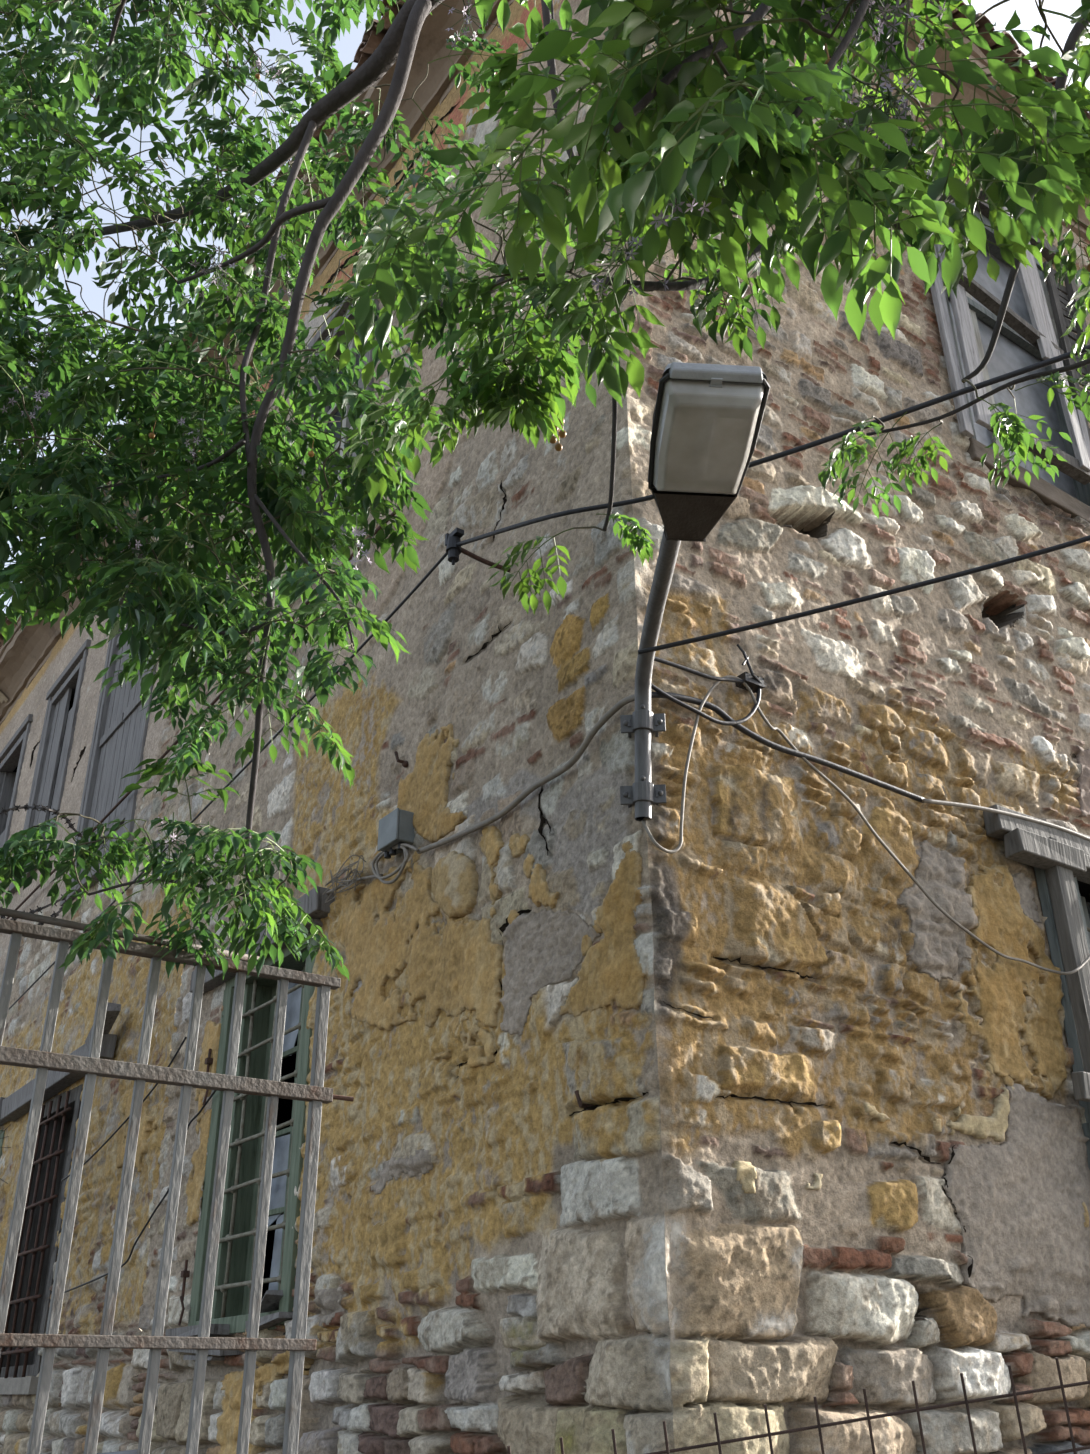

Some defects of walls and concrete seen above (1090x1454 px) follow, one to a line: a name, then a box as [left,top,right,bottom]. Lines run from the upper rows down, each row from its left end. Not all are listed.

hole [981,604,1025,628]
crack [538,786,551,855]
flaking render [340,723,646,1068]
crack [569,1092,648,1116]
crack [715,1094,831,1107]
flaking render [731,1161,757,1193]
flaking render [805,1173,823,1190]
crack [891,1142,973,1277]